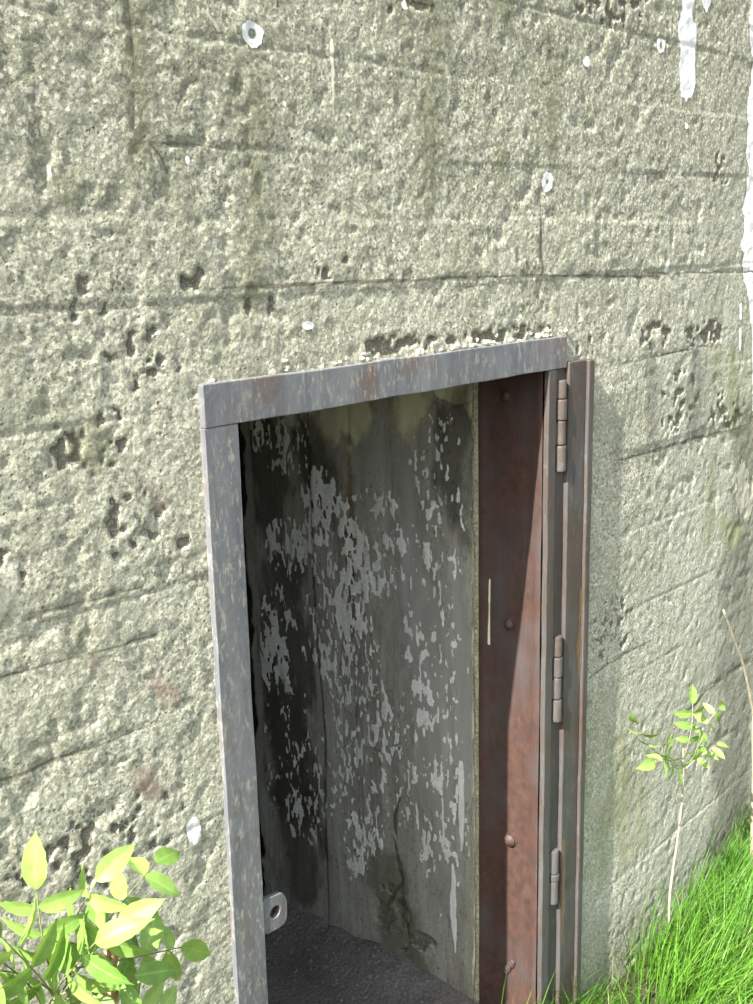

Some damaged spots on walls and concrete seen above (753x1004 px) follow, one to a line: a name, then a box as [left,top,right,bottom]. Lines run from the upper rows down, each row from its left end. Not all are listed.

spalling [576,0,648,28]
water stain [678,0,711,102]
crack [175,79,198,113]
crack [128,92,225,173]
water stain [739,0,753,411]
crack [210,197,753,290]
crack [618,424,746,460]
crack [18,586,144,625]
crack [0,633,157,678]
peeling [249,412,474,884]
crack [0,727,142,782]